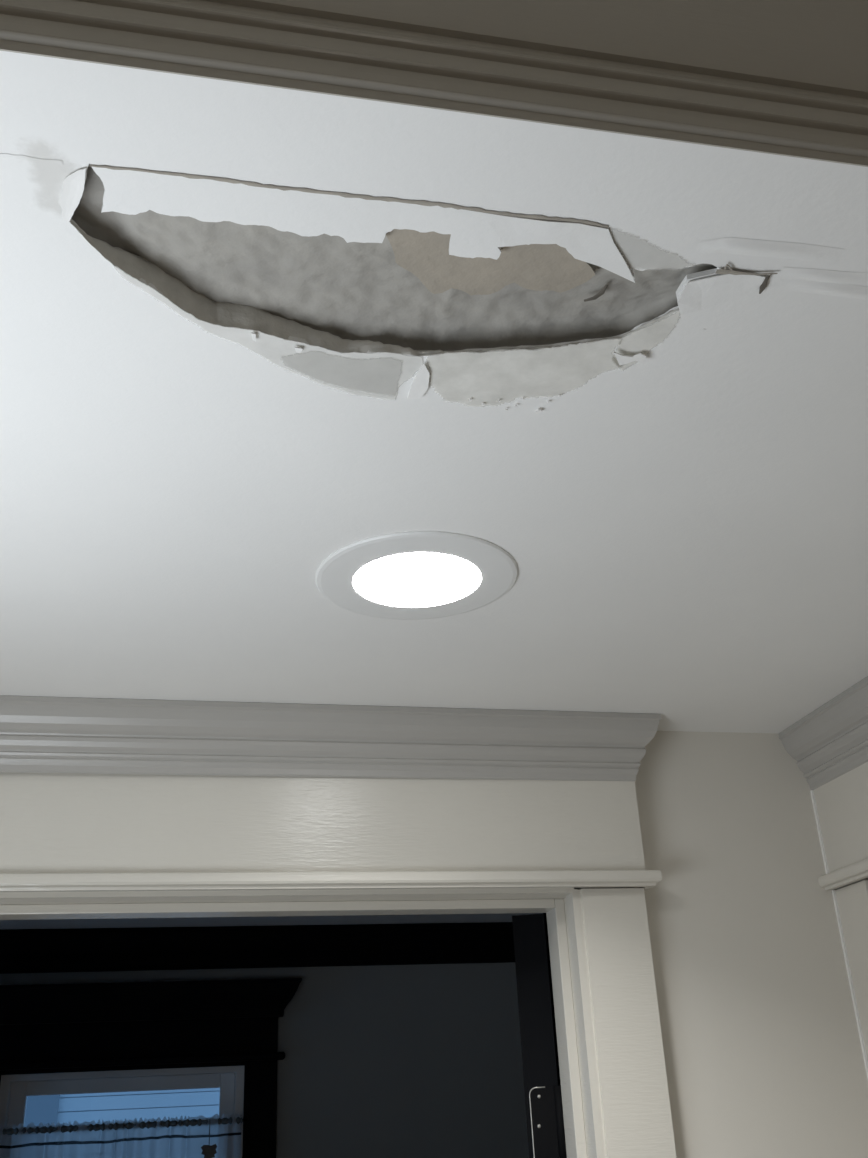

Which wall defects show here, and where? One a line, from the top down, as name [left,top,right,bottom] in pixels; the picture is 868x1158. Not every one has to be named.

peeling [384,203,635,283]
peeling [677,274,765,315]